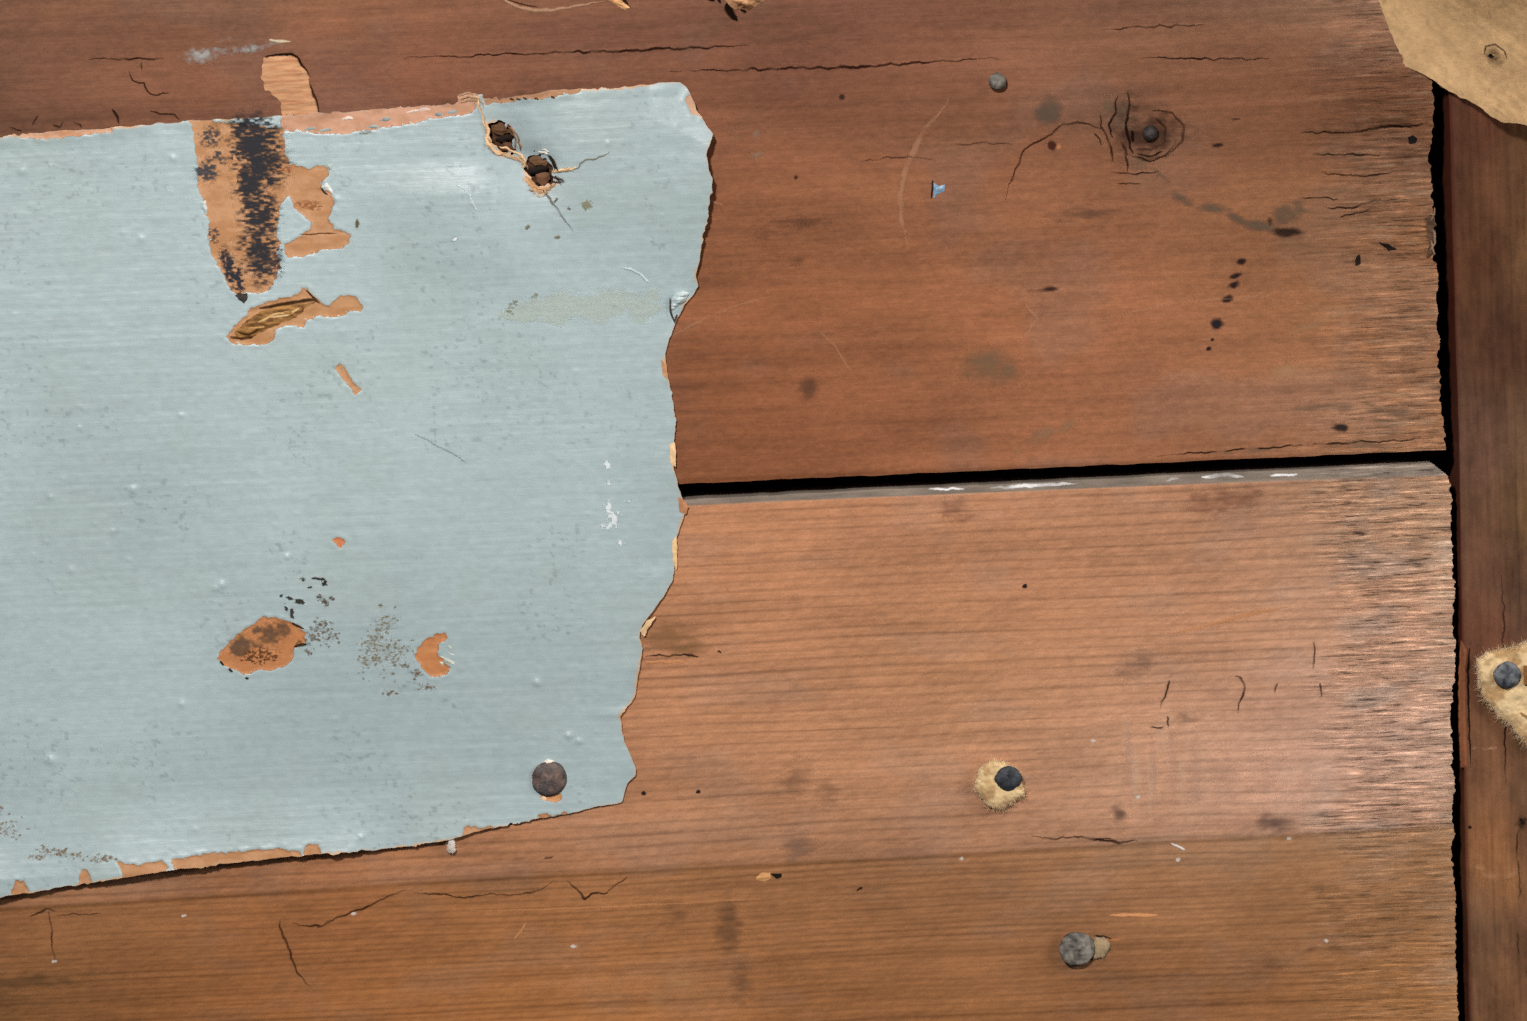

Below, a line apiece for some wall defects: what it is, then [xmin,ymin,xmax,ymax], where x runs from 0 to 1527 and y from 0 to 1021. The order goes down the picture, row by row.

crack [404,45,996,72]
peeling [189,89,581,345]
peeling [335,363,361,395]
peeling [217,616,307,680]
peeling [415,632,455,677]
peeling [11,880,29,895]
peeling [79,869,92,885]
peeling [117,844,321,877]
crack [279,877,627,983]